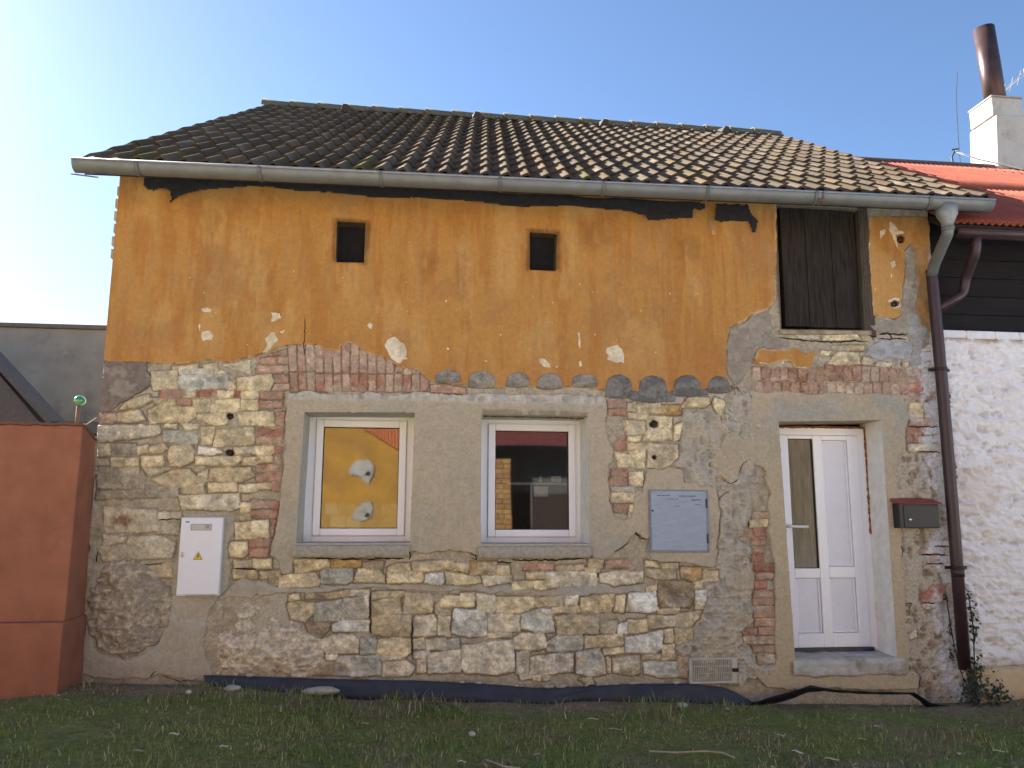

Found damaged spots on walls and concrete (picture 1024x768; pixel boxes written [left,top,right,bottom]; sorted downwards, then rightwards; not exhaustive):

peeling [869,222,904,249]
peeling [199,324,213,341]
peeling [606,339,624,363]